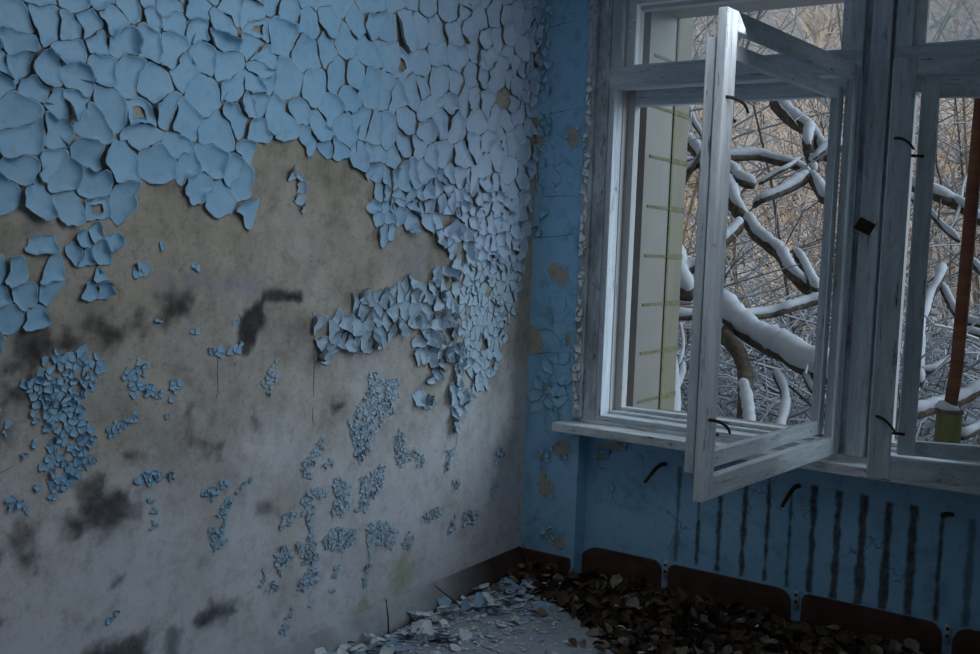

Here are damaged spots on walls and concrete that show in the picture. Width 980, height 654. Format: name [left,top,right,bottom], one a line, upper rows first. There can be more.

leakage [164,293,191,322]
leakage [239,290,302,354]
peeling [0,0,546,594]
leakage [69,481,128,535]
leakage [715,495,723,571]
leakage [739,486,748,575]
leakage [806,485,818,593]
leakage [829,491,843,598]
leakage [853,495,868,604]
leakage [878,503,893,609]
leakage [904,505,918,615]
leakage [91,636,143,654]